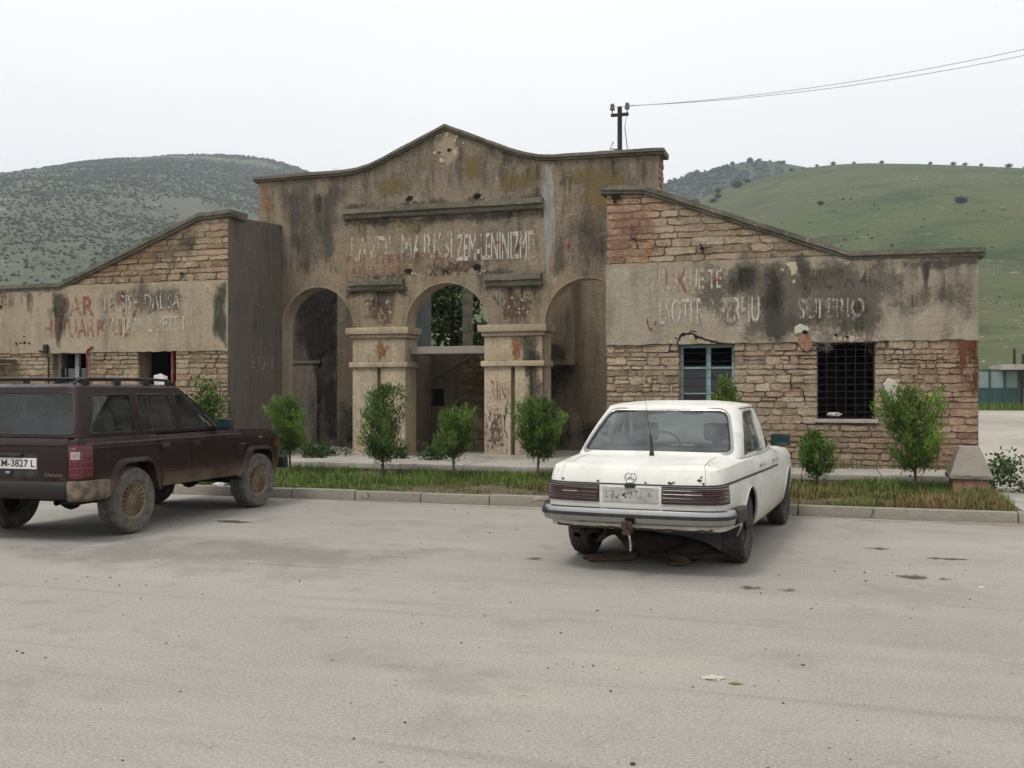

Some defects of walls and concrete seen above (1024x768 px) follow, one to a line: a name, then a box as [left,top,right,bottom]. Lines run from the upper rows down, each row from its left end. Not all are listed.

spalling [433,131,464,165]
water stain [52,293,68,344]
water stain [214,284,226,347]
crack [676,330,727,345]
spalling [794,324,814,352]
water stain [698,251,978,351]
flaking render [461,355,512,455]